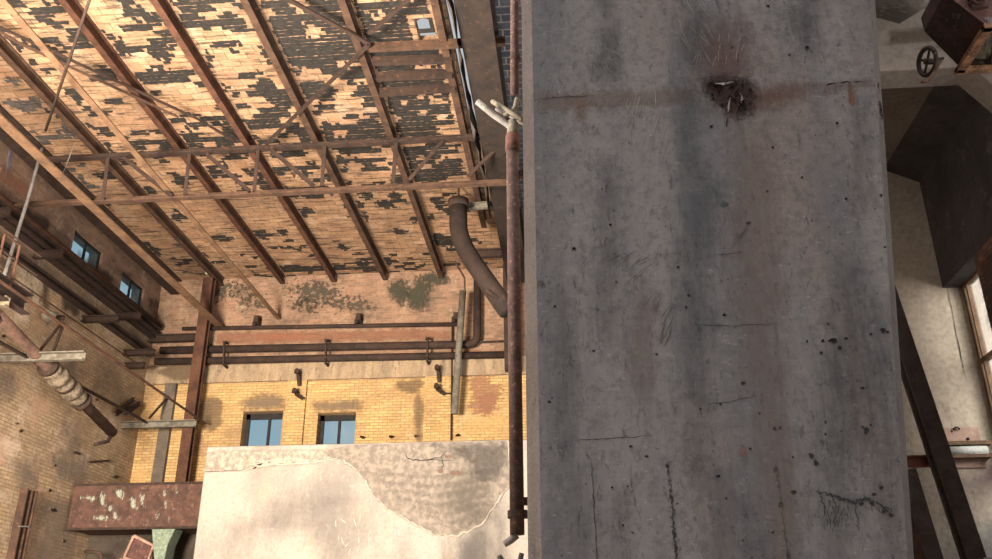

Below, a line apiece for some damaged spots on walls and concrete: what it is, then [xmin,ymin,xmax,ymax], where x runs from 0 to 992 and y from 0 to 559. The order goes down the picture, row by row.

peeling [0,0,94,74]
peeling [101,0,205,96]
peeling [169,0,255,68]
peeling [63,88,198,189]
peeling [167,45,333,218]
peeling [261,0,467,222]
peeling [240,229,456,318]
leakage [388,272,450,311]
peeling [328,434,509,537]
crack [406,454,452,467]
crack [666,461,680,559]
crack [816,486,894,532]